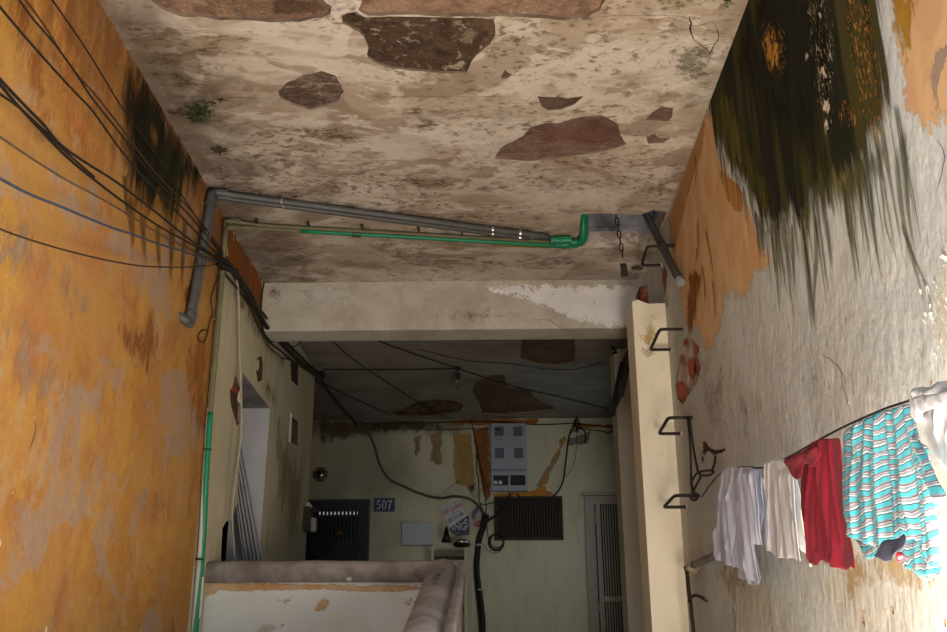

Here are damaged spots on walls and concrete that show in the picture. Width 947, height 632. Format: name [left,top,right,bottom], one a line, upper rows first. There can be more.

spalling [151,0,605,74]
spalling [278,71,344,110]
spalling [495,96,626,161]
spalling [388,399,463,417]
flaking render [472,339,612,415]